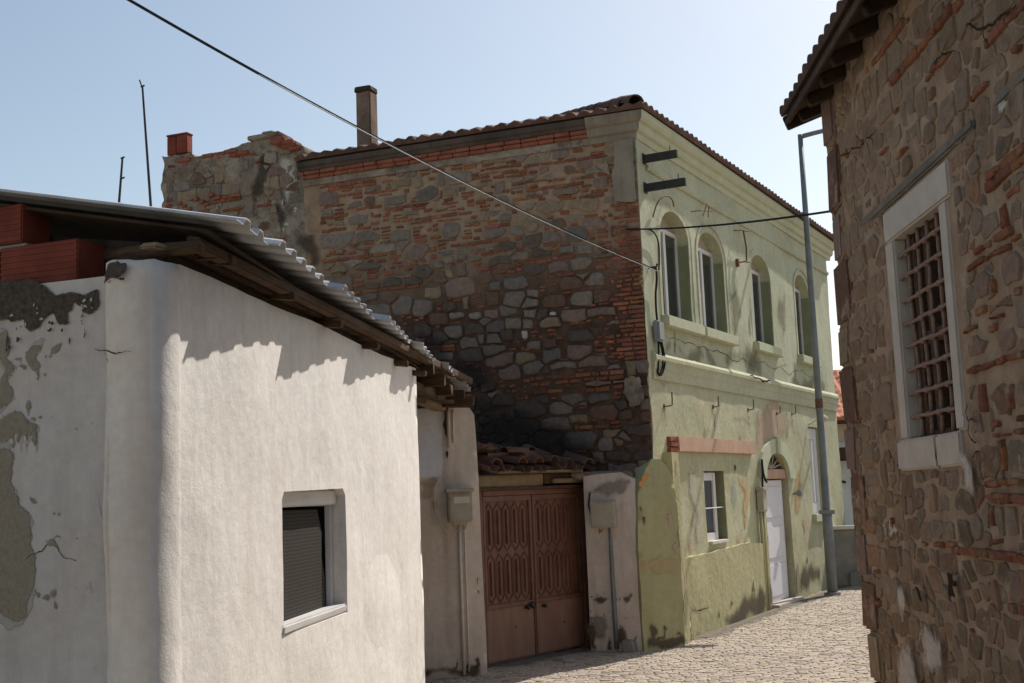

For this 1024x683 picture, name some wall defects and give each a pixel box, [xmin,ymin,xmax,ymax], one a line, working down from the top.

crack [931,3,1017,67]
crack [839,131,876,157]
crack [670,337,808,382]
peeling [0,261,127,630]
water stain [718,578,772,624]
water stain [648,625,686,648]